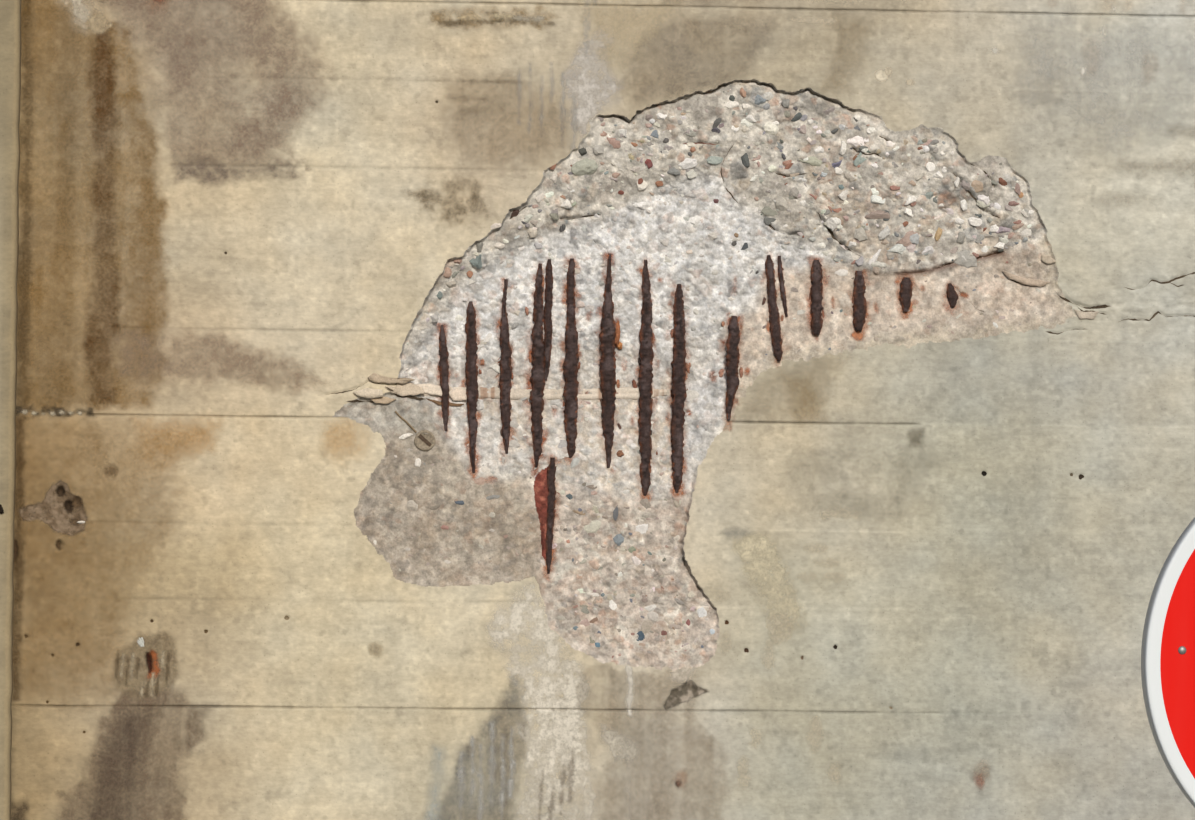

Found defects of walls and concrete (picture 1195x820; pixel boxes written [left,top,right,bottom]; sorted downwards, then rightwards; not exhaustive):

water stain [17,0,308,408]
corrosion [762,255,788,361]
corrosion [807,258,834,335]
corrosion [851,271,877,340]
corrosion [895,277,914,319]
corrosion [946,283,968,308]
crack [1045,272,1195,335]
corrosion [437,254,691,578]
spalling [332,79,1099,709]
corrosion [712,316,750,420]
water stain [63,691,201,820]